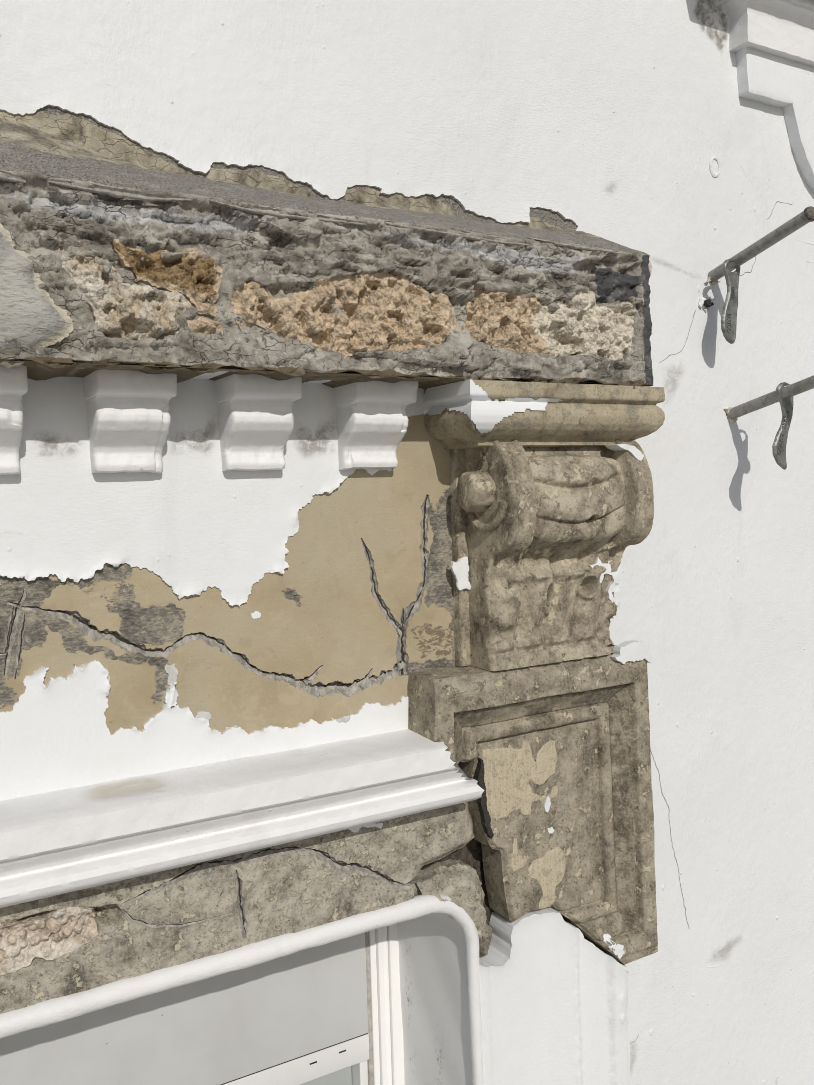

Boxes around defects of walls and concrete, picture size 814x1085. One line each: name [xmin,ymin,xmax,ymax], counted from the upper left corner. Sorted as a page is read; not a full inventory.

spalling [61,239,638,362]
peeling [291,371,368,382]
crack [0,494,430,698]
peeling [0,414,471,735]
crack [119,846,422,939]